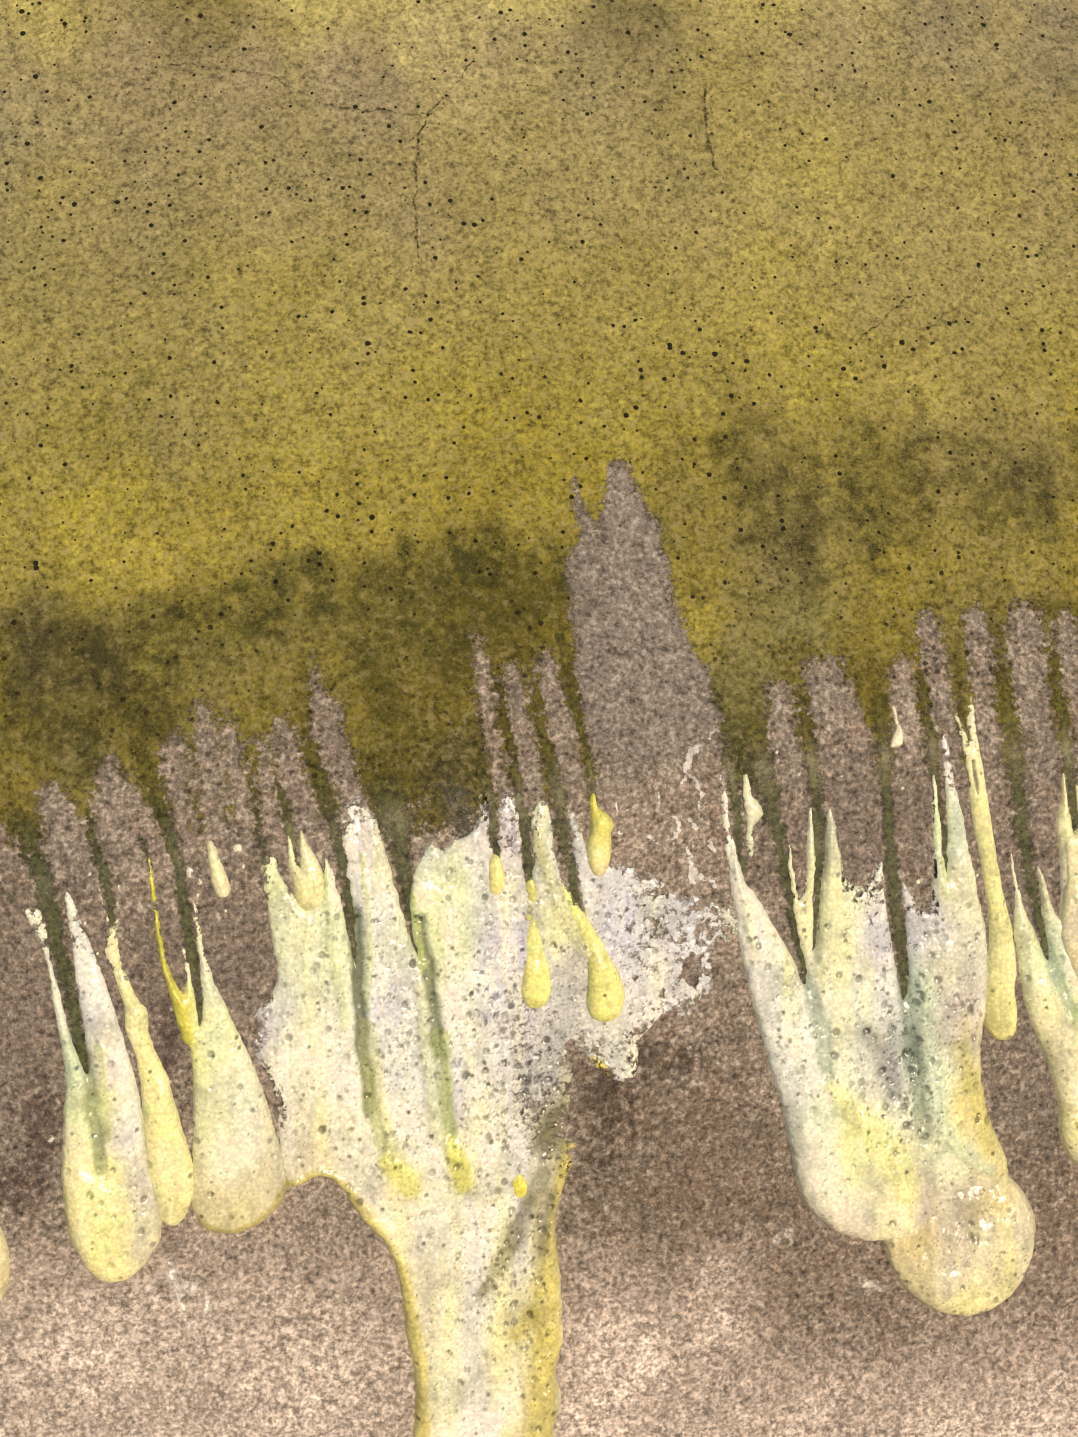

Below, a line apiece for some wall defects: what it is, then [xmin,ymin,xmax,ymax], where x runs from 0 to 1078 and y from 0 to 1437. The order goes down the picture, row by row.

leakage [0,621,278,1230]
leakage [275,781,301,867]
leakage [303,728,358,964]
leakage [368,765,418,955]
leakage [426,751,501,857]
leakage [496,685,533,881]
leakage [531,690,581,909]
peeling [564,461,724,889]
leakage [721,666,948,1000]
leakage [988,642,1078,961]
leakage [557,1046,1078,1437]
leakage [981,984,1078,1320]